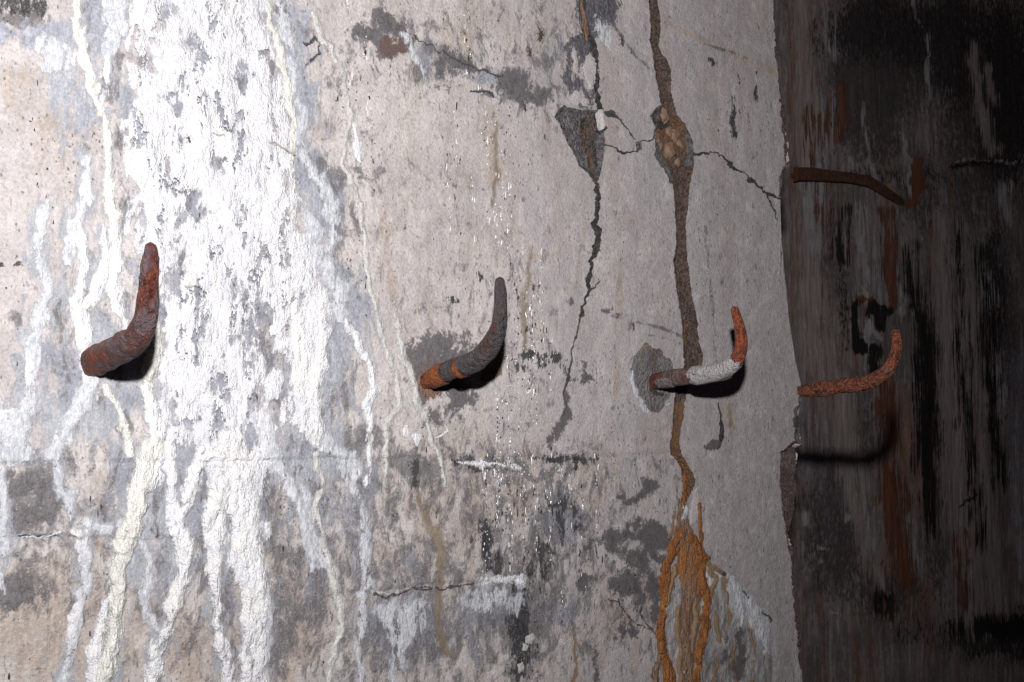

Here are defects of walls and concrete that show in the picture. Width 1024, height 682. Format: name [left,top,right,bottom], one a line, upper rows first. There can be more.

crack [415,35,503,98]
peeling [554,0,623,183]
leakage [0,0,772,682]
corrosion [423,362,471,389]
crack [546,182,620,449]
crack [578,0,781,508]
leakage [782,0,1024,642]
crack [373,574,527,600]
corrosion [651,464,712,682]